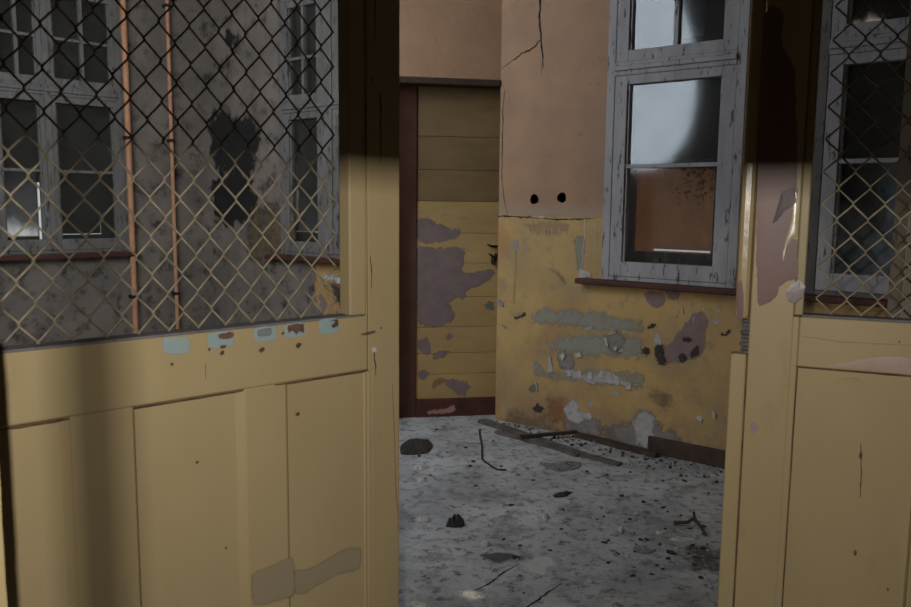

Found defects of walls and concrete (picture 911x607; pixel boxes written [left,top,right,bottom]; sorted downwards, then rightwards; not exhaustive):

crack [504,0,544,72]
peeling [756,5,805,306]
peeling [416,218,495,360]
peeling [419,370,471,415]
peeling [514,290,720,398]
flaking render [563,399,680,449]
peeling [828,357,911,375]